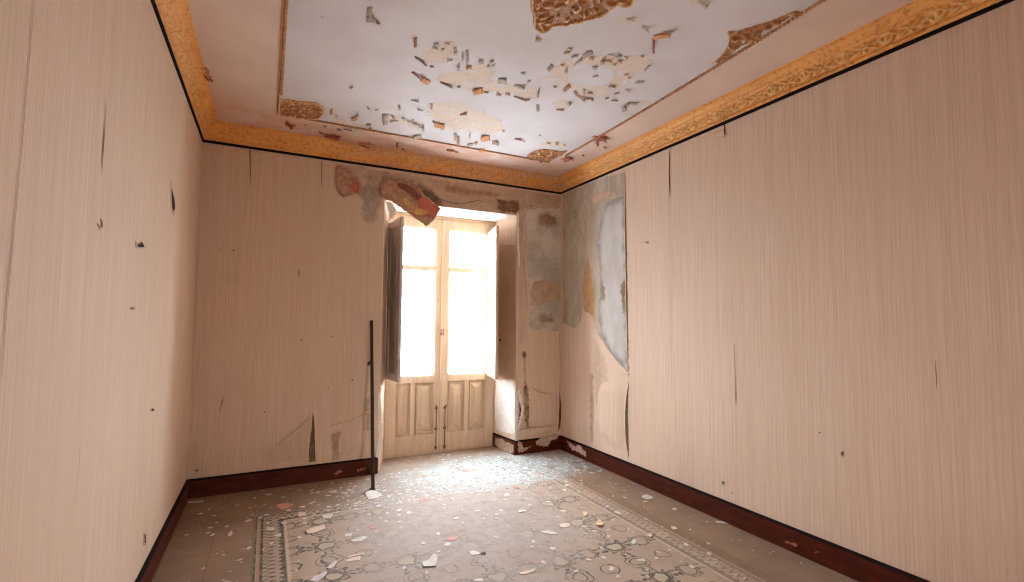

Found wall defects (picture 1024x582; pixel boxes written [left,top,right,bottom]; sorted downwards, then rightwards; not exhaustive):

peeling [366,7,383,25]
peeling [285,15,671,154]
peeling [515,135,584,162]
flaking render [334,164,629,372]
peeling [495,433,586,457]